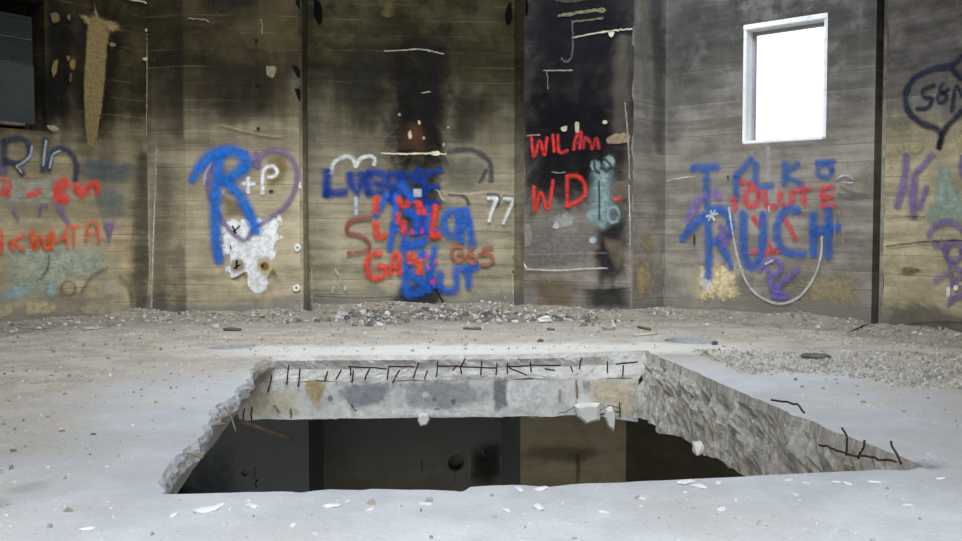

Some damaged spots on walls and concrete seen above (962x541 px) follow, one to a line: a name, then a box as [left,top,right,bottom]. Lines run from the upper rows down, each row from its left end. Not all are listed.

corrosion [306,381,325,397]
spalling [158,351,922,494]